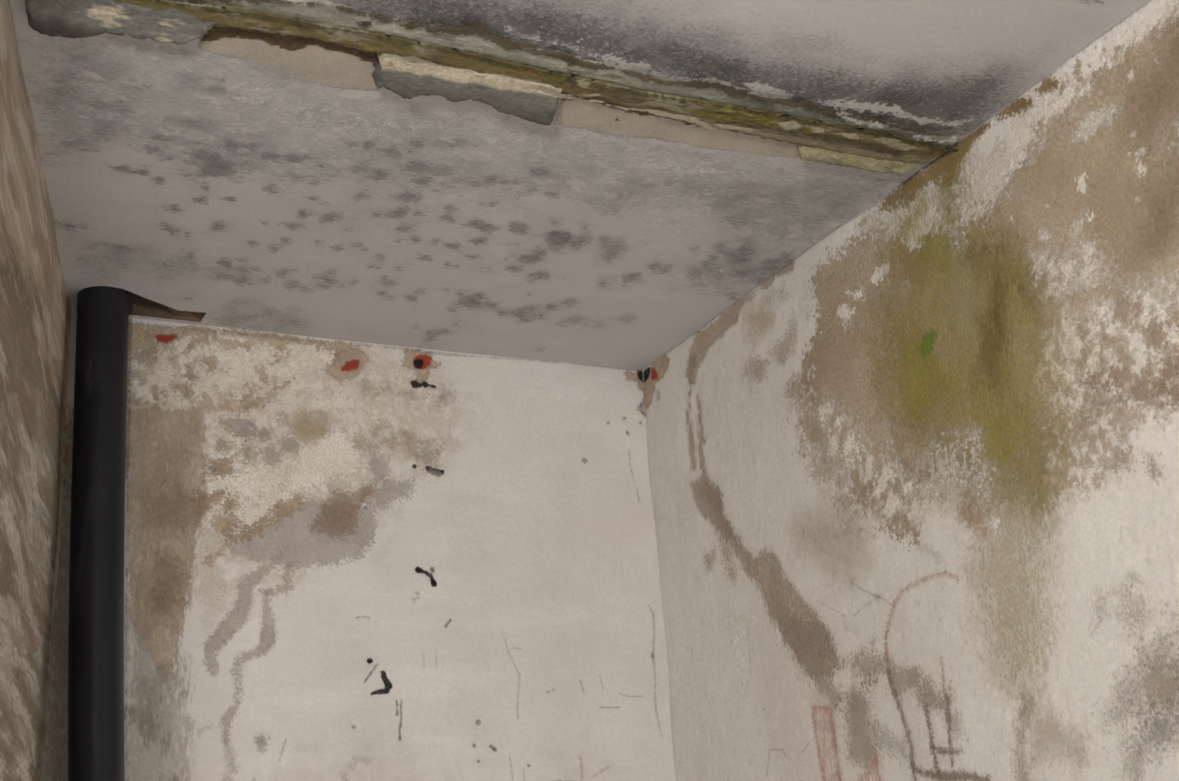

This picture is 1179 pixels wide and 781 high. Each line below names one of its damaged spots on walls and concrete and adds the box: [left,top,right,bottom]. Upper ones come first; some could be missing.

leakage [32,44,959,781]
spalling [172,0,934,159]